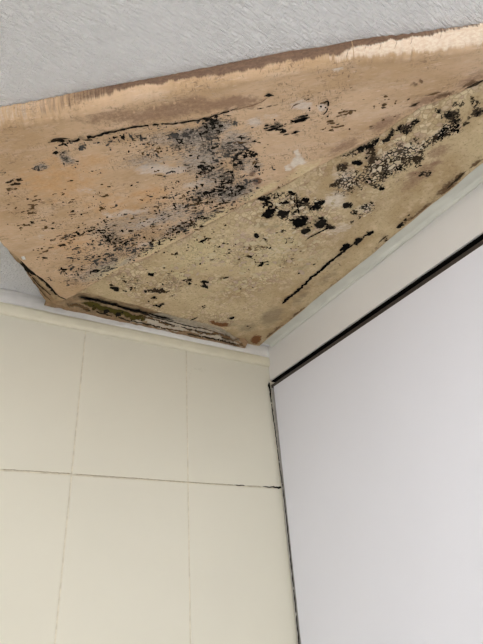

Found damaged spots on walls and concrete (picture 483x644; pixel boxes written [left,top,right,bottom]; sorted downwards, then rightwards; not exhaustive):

peeling [352,23,483,65]
crack [48,93,274,143]
peeling [239,97,329,128]
water stain [0,41,483,347]